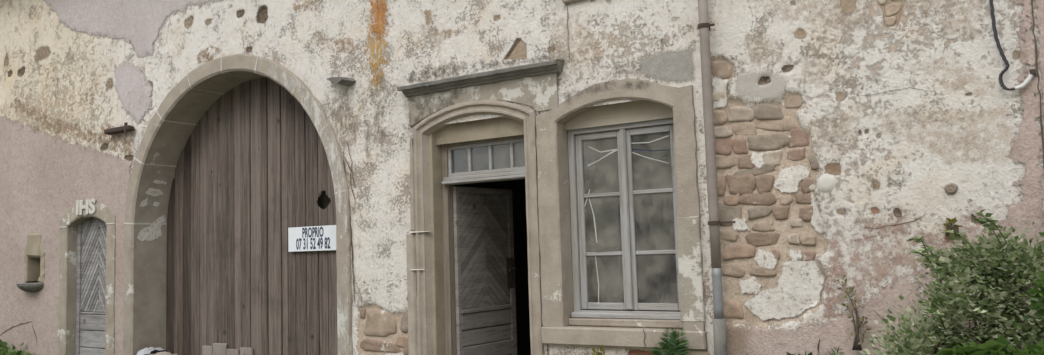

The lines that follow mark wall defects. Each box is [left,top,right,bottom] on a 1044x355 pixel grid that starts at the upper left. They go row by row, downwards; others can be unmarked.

spalling [4,47,51,77]
flaking render [44,0,223,125]
spalling [236,5,268,23]
rust [364,0,388,88]
flaking render [0,99,167,355]
peeling [270,61,356,232]
spalling [704,0,1044,355]
spalling [337,297,409,355]